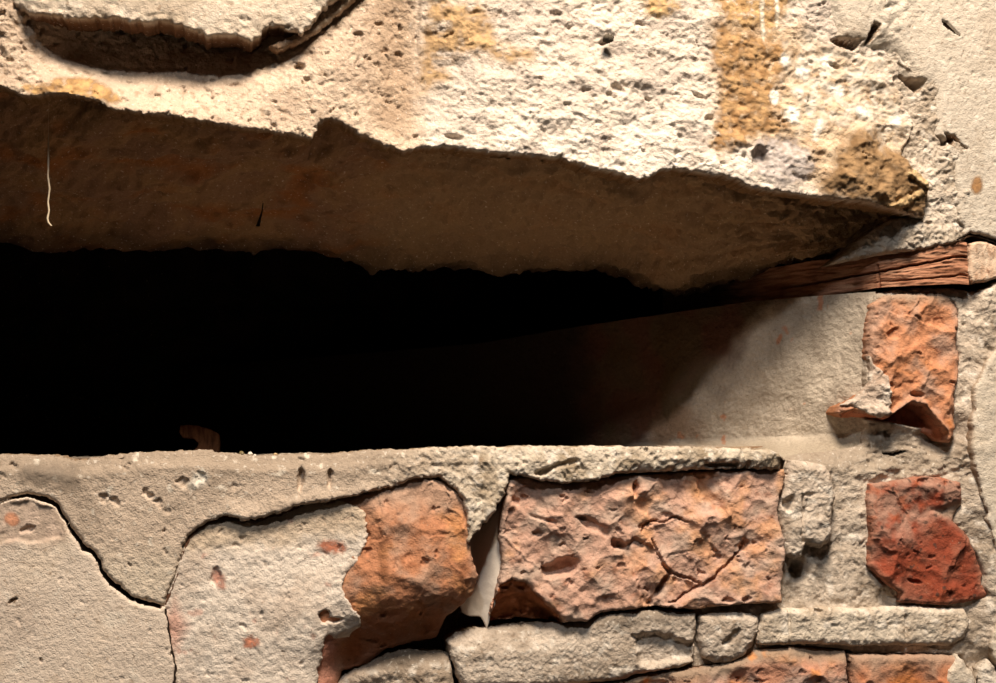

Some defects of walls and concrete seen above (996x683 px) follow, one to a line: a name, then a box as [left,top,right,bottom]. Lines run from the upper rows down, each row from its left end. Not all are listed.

peeling [889,170,929,210]
peeling [188,469,208,489]
crack [11,494,300,683]